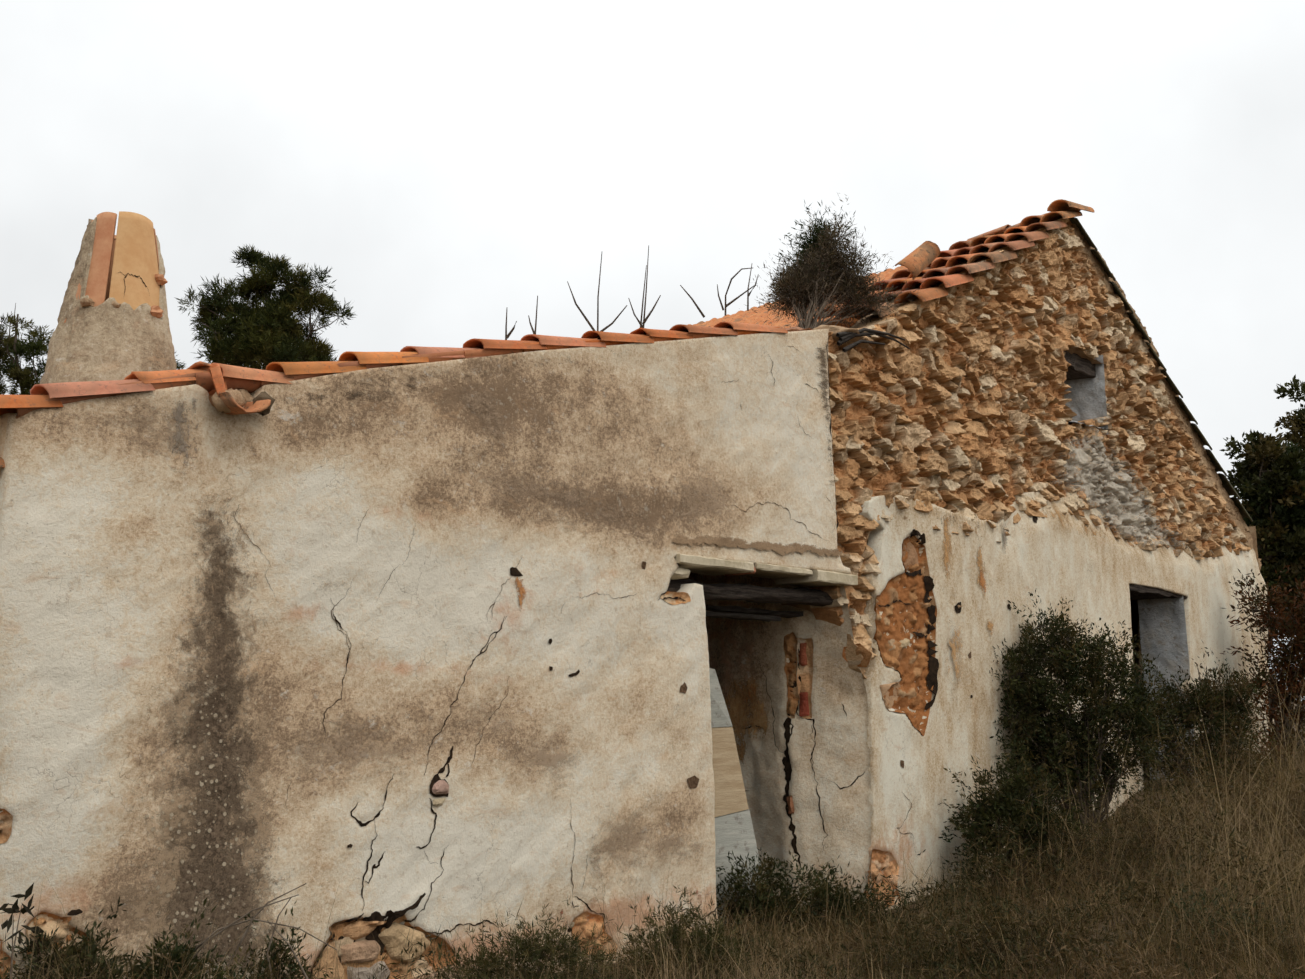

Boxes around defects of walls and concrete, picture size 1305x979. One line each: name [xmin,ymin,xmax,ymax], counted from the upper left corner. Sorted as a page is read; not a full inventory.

spalling [809,217,1262,736]
spalling [0,809,13,844]
spalling [0,909,90,979]
leakage [121,496,286,975]
crack [323,525,416,763]
spalling [310,893,455,979]
crack [351,558,522,934]
spalling [783,632,814,719]
crack [745,649,865,865]
spalling [864,849,901,909]